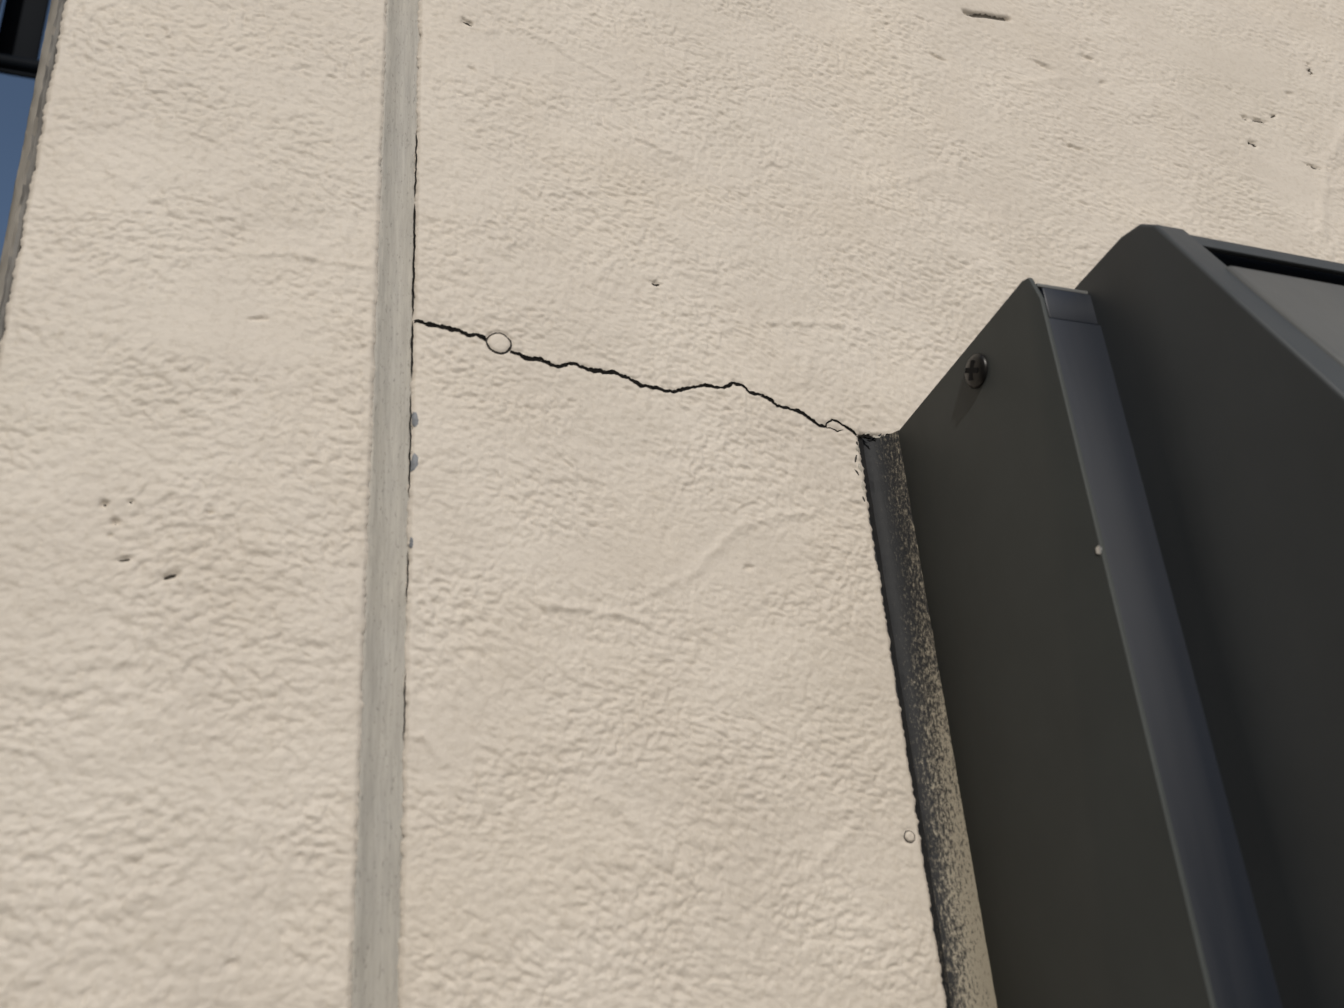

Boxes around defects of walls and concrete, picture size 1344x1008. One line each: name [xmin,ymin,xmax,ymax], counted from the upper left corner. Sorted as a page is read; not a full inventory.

crack [408,134,859,493]
crack [403,553,411,601]
crack [400,670,408,740]